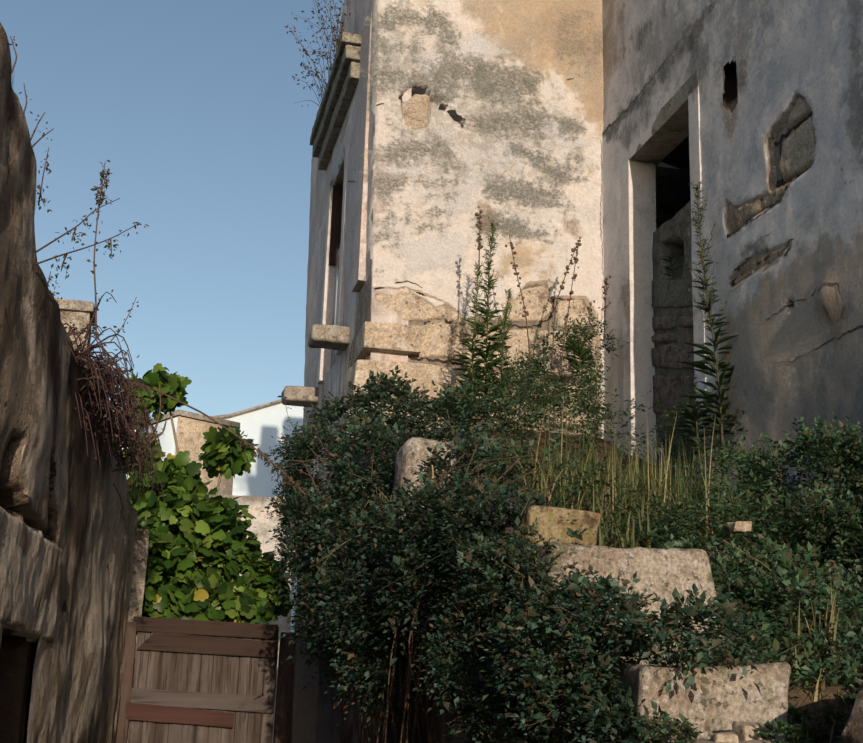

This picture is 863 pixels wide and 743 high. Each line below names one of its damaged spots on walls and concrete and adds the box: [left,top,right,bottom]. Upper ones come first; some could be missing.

peeling [455,31,511,63]
flaking render [399,51,448,129]
damp [360,0,587,257]
peeling [384,163,436,180]
flaking render [727,96,817,238]
flaking render [730,231,793,286]
flaking render [339,233,599,439]
crack [766,299,806,320]
crack [776,325,863,363]